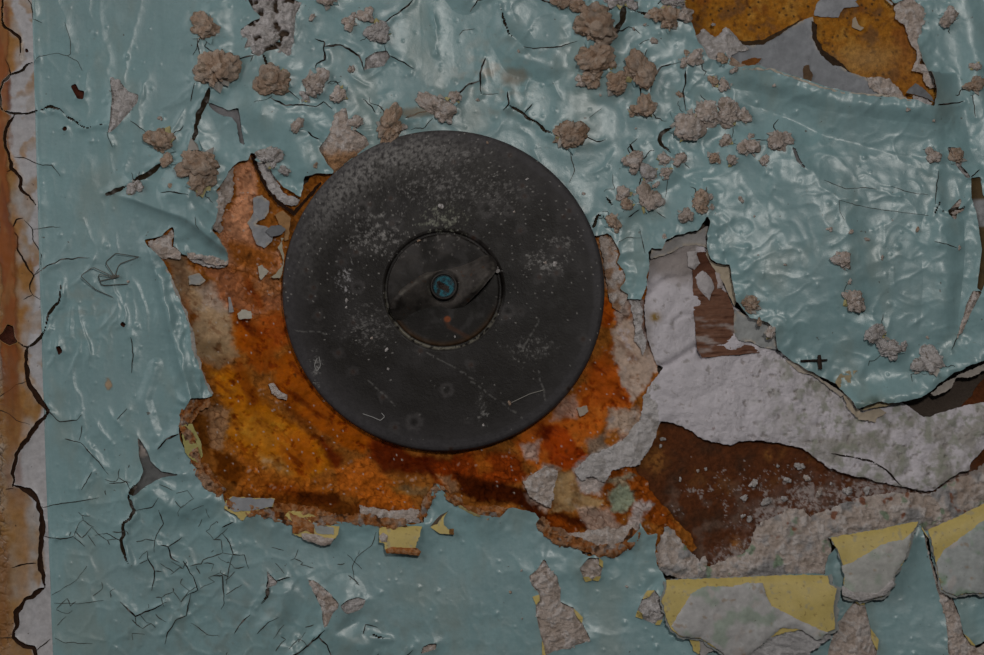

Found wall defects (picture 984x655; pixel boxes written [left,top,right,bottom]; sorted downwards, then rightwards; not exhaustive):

spalling [108,77,138,133]
spalling [240,0,302,56]
crack [315,39,364,70]
peeling [682,0,937,106]
corrosion [0,0,20,402]
crack [0,0,332,655]
spalling [145,108,984,582]
corrosion [961,379,984,407]
corrosion [635,422,984,579]
crack [338,533,376,585]
spalling [529,560,590,655]
peeling [635,502,984,655]